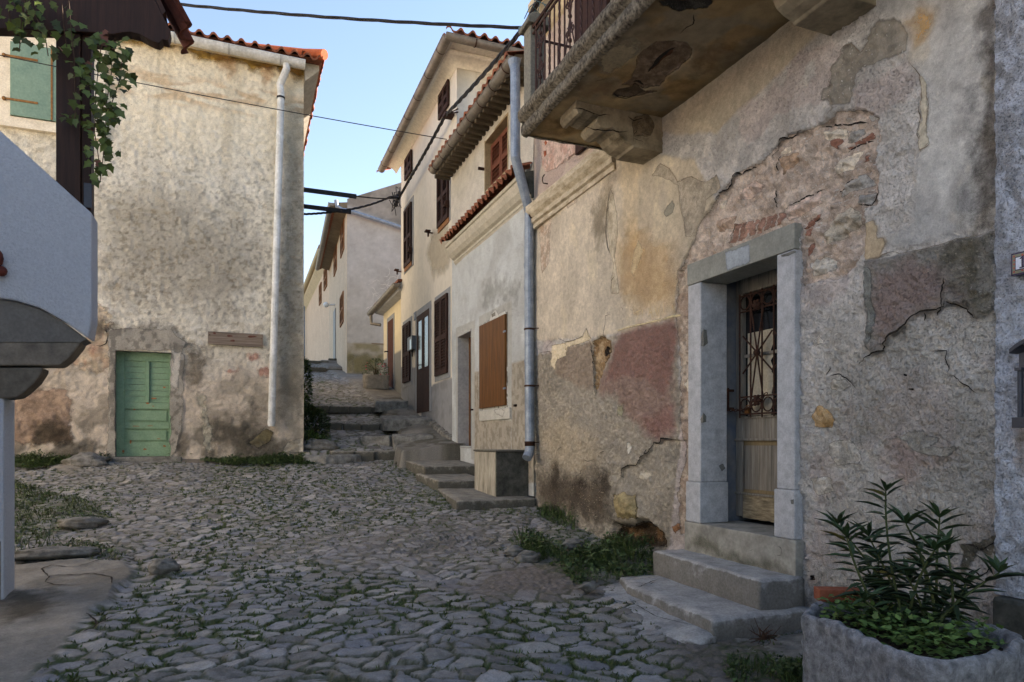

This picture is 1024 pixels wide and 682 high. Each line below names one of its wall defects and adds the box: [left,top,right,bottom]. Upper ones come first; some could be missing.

flaking render [615,40,692,97]
crack [653,22,879,233]
flaking render [652,19,908,534]
flaking render [550,330,612,390]
crack [826,278,974,387]
crack [937,350,976,393]
damp [31,421,71,445]
crack [580,438,676,532]